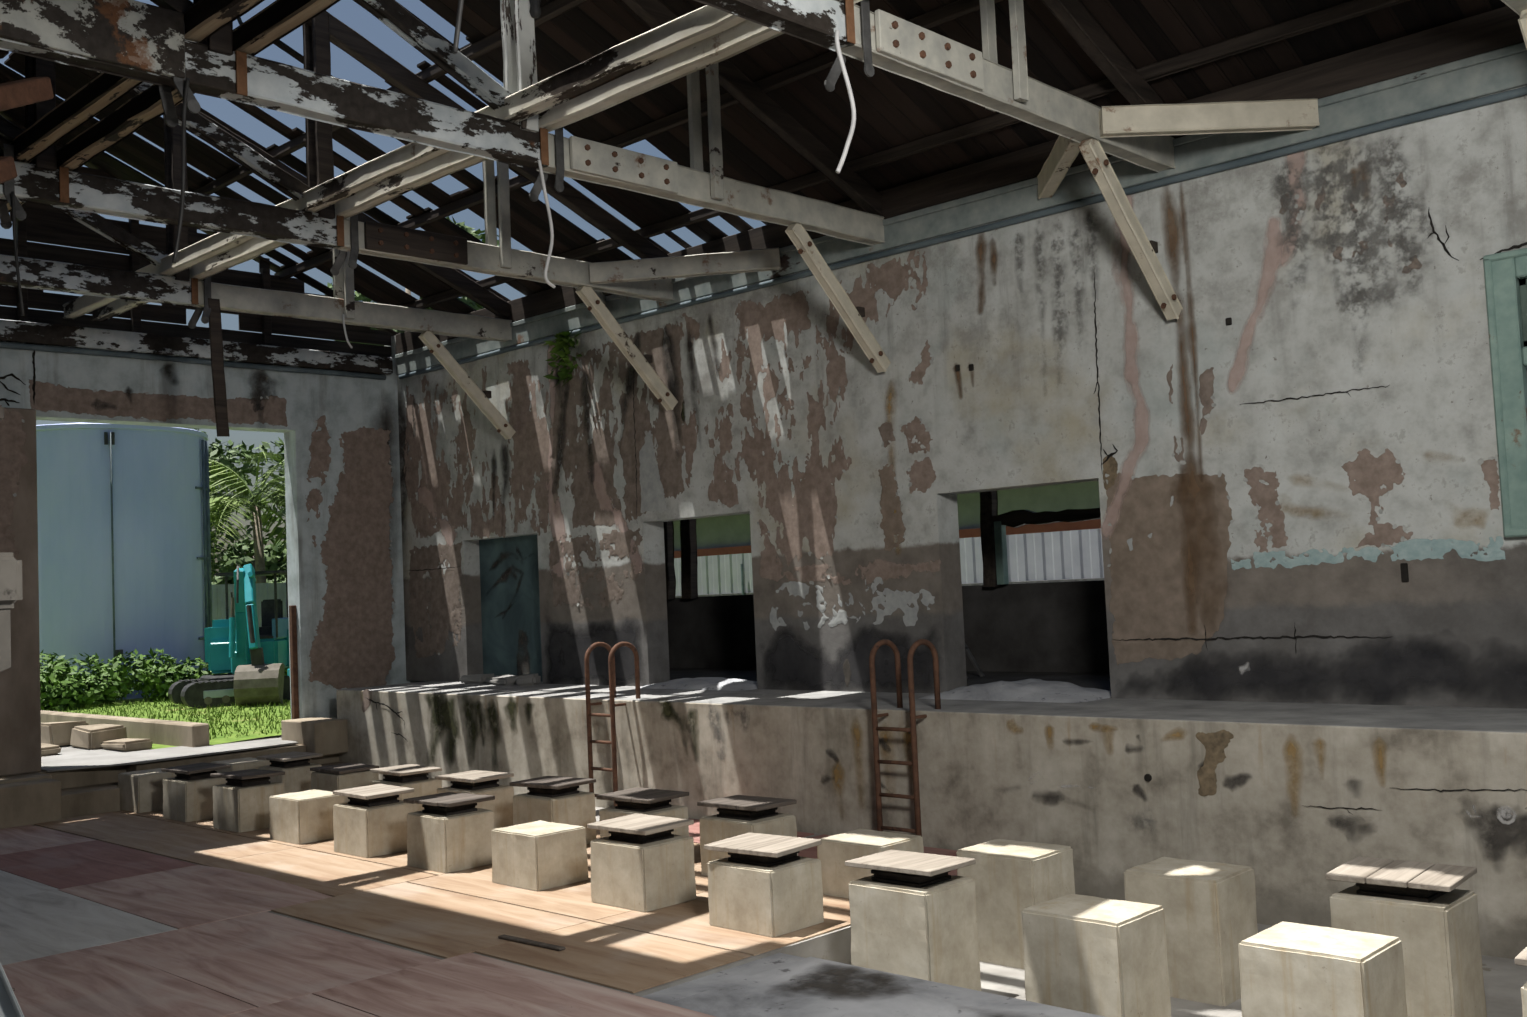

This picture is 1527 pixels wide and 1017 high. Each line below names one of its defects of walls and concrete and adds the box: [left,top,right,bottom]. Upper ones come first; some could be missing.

corrosion [1165,192,1187,272]
peeling [1279,180,1326,225]
damp [1276,150,1424,303]
crack [0,350,36,406]
peeling [1199,367,1216,435]
peeling [306,250,941,712]
corrosion [1177,295,1215,632]
peeling [1342,448,1413,548]
peeling [1103,436,1288,665]
spalling [1400,563,1409,582]
damp [1170,641,1527,705]
damp [1468,805,1527,857]